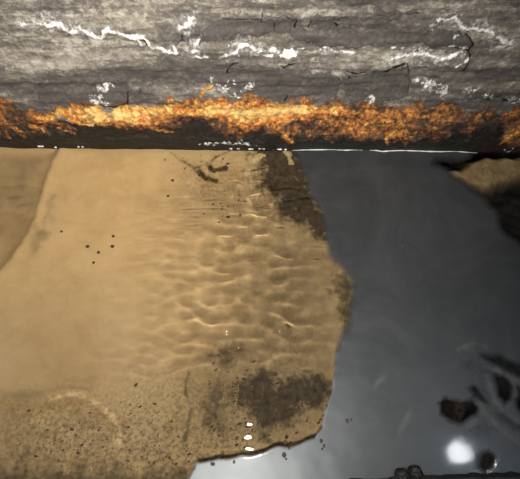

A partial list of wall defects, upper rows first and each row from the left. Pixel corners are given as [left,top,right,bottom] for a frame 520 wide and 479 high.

leakage [0,6,178,73]
leakage [223,41,304,59]
crack [348,63,410,78]
crack [457,33,474,72]
leakage [431,14,514,49]
rust [0,84,520,148]